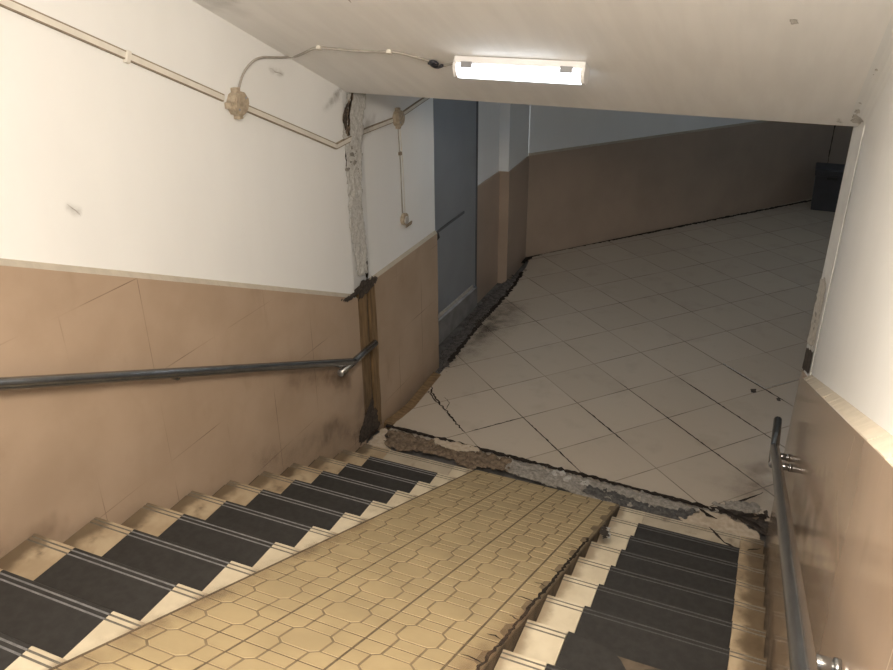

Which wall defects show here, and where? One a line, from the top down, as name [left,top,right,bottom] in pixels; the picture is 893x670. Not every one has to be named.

spalling [343,93,353,136]